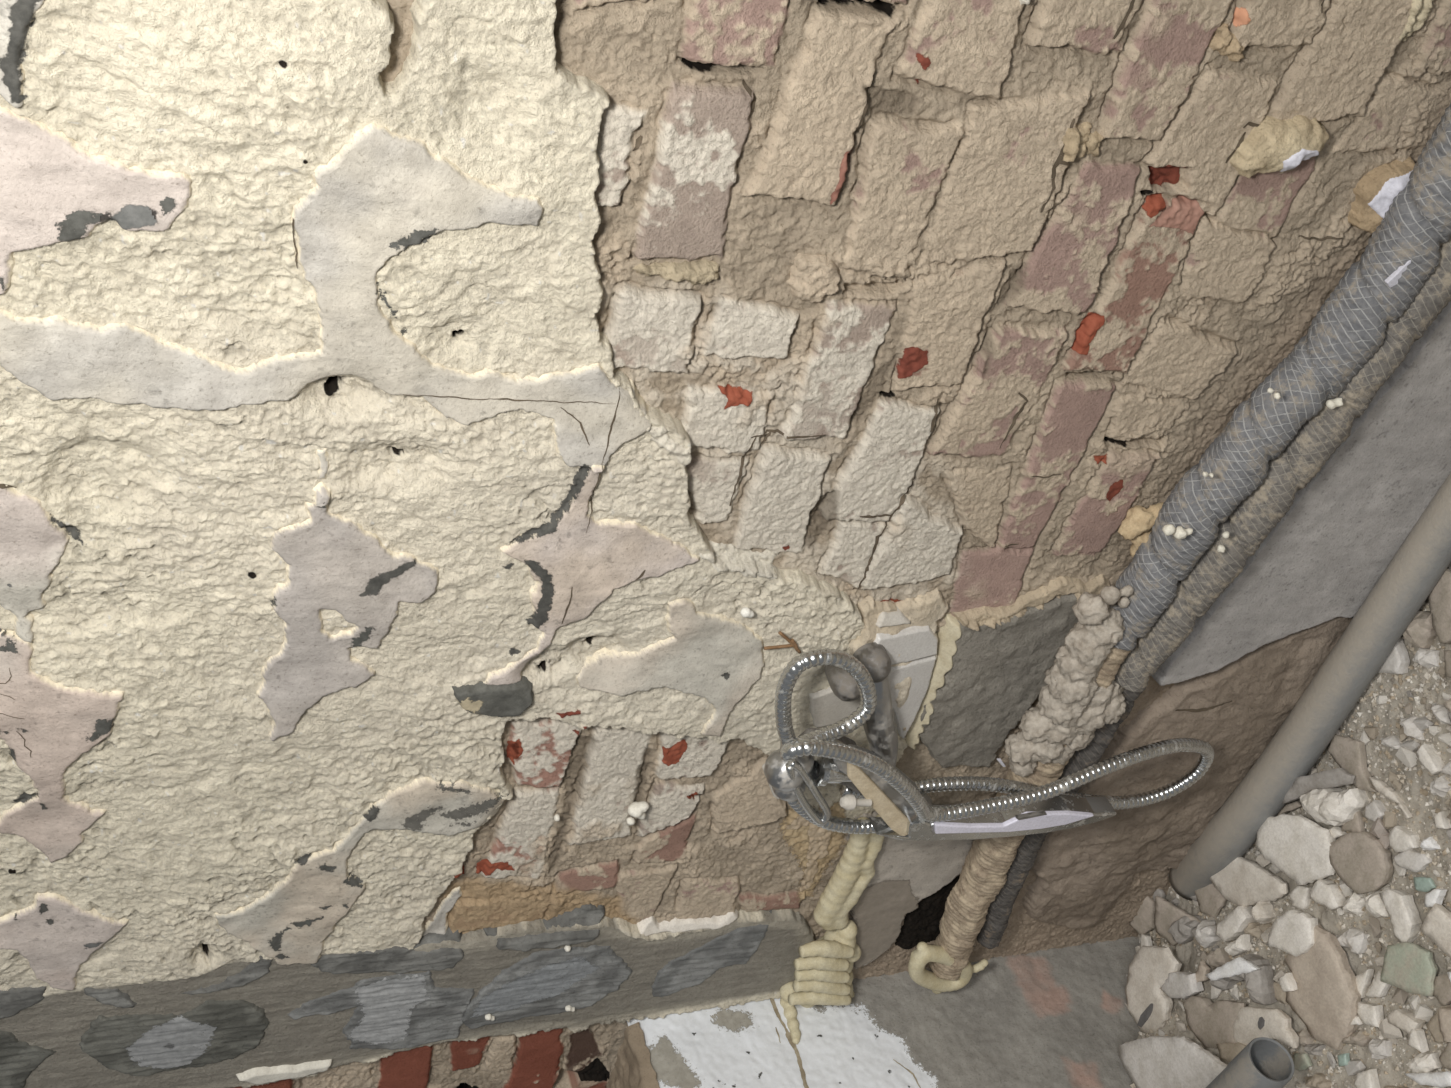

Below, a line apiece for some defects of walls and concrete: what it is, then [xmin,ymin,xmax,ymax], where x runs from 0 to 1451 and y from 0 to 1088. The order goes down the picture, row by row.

flaking render [0,0,1451,685]
peeling [0,483,125,863]
peeling [256,448,439,741]
flaking render [214,598,848,965]
crack [853,473,915,590]
flaking render [895,695,1039,805]
flaking render [969,868,1171,963]
flaking render [1114,676,1175,736]